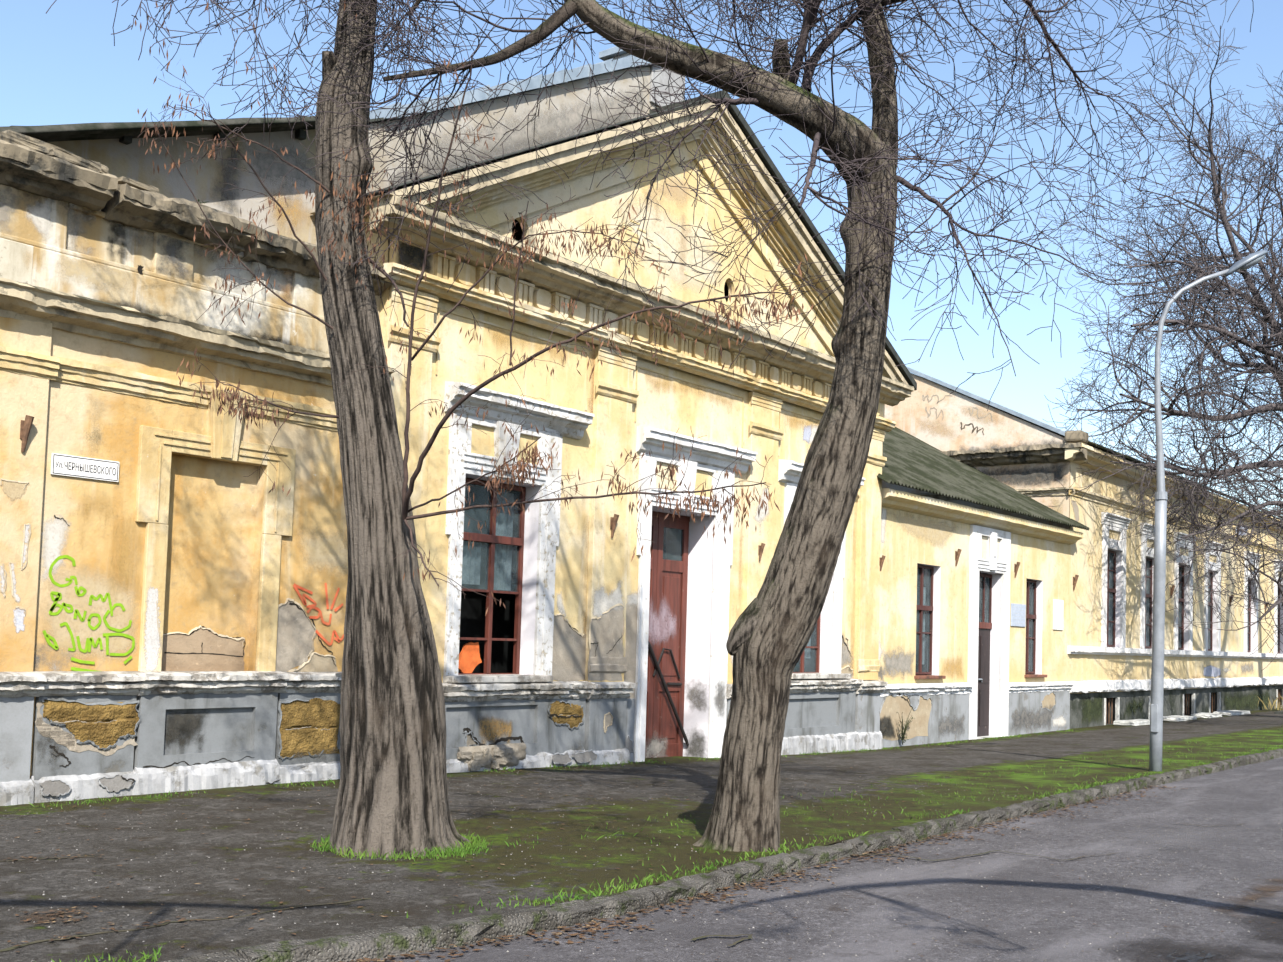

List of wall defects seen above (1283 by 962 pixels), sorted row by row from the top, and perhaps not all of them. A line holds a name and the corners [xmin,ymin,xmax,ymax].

damp [64,225,159,314]
damp [165,240,185,273]
flaking render [144,587,246,671]
peeling [275,598,338,672]
peeling [552,593,638,699]
flaking render [35,697,141,756]
flaking render [278,698,340,761]
flaking render [547,700,584,730]
peeling [880,693,932,741]